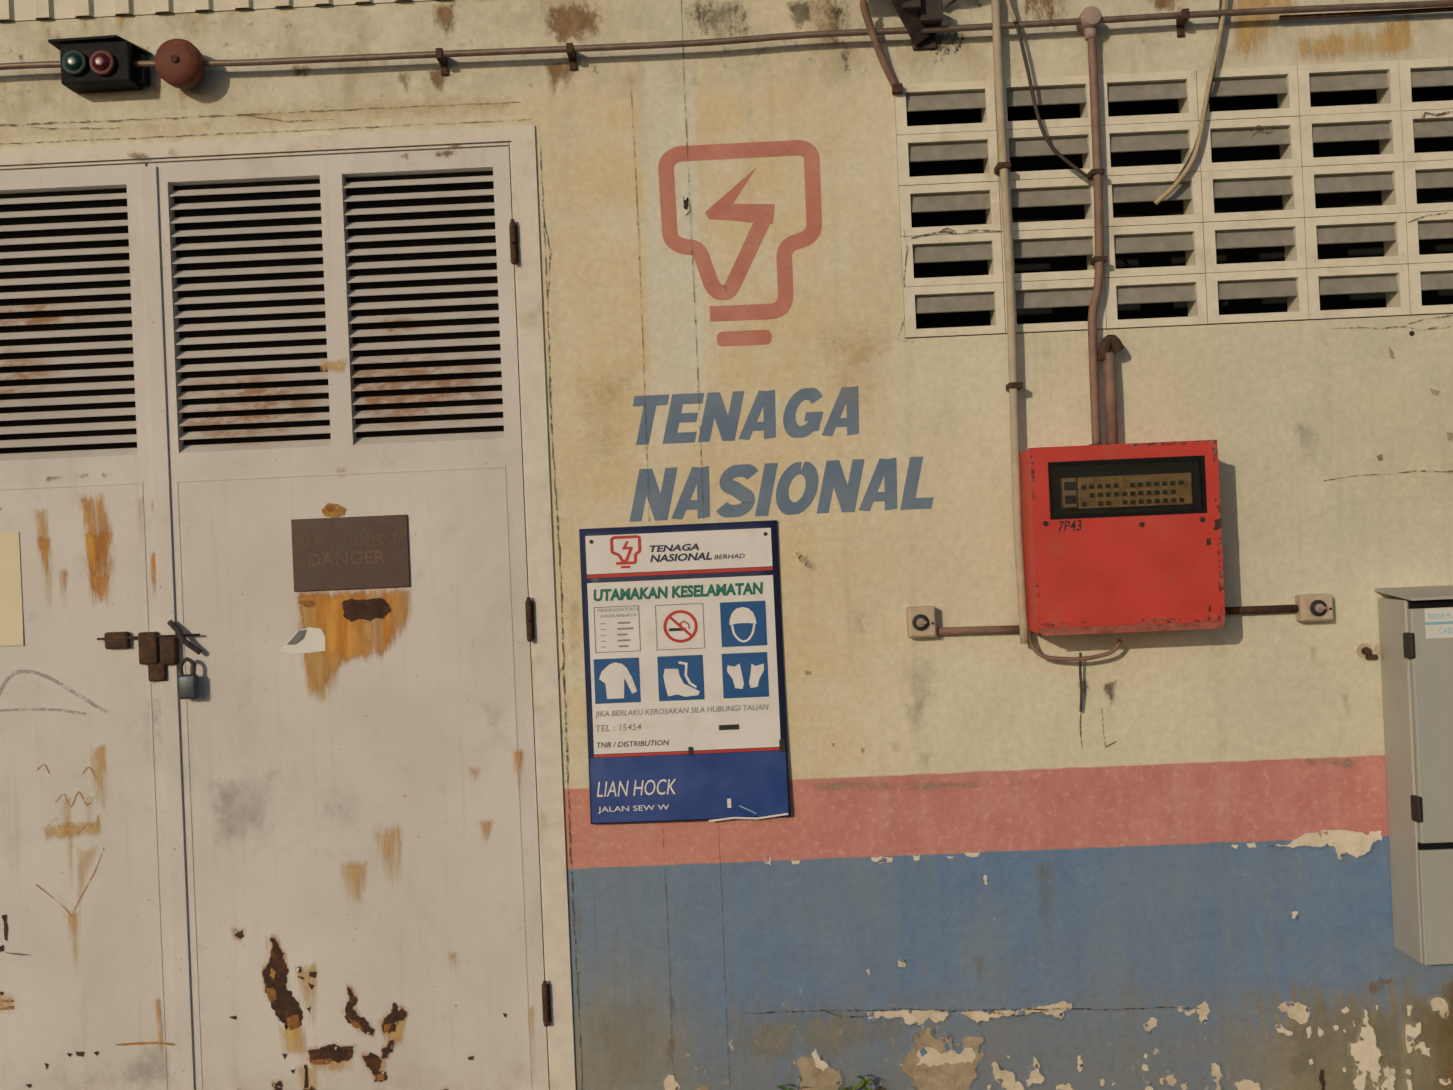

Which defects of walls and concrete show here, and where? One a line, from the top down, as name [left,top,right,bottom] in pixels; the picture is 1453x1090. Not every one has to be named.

corrosion [1238,0,1290,53]
corrosion [37,512,49,566]
corrosion [84,498,109,599]
corrosion [298,591,408,697]
peeling [1231,826,1385,863]
corrosion [262,938,407,1090]
peeling [792,1048,845,1090]
peeling [858,997,1083,1090]
peeling [1178,1001,1210,1024]
peeling [1208,1059,1279,1090]
peeling [1274,994,1450,1090]
damp [1445,999,1453,1090]